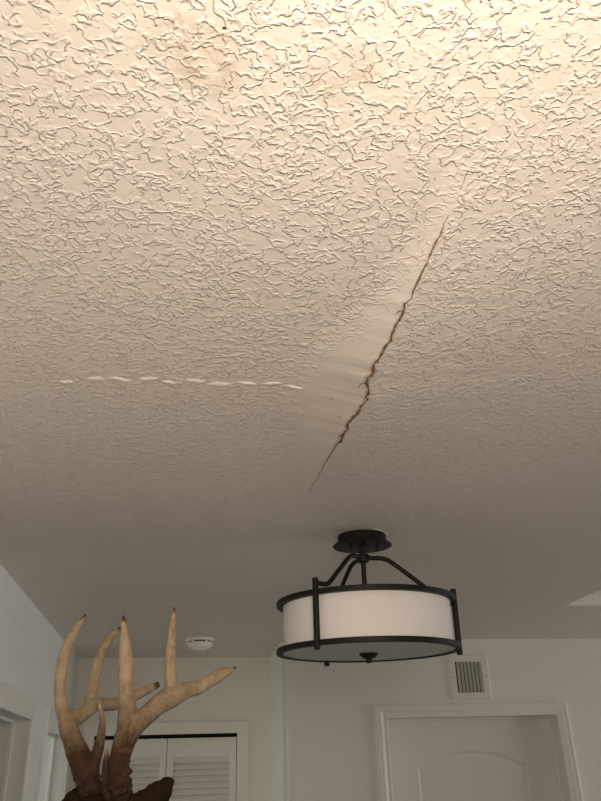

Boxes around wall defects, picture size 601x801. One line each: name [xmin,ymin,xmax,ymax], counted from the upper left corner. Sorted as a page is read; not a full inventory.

crack [309,214,449,492]